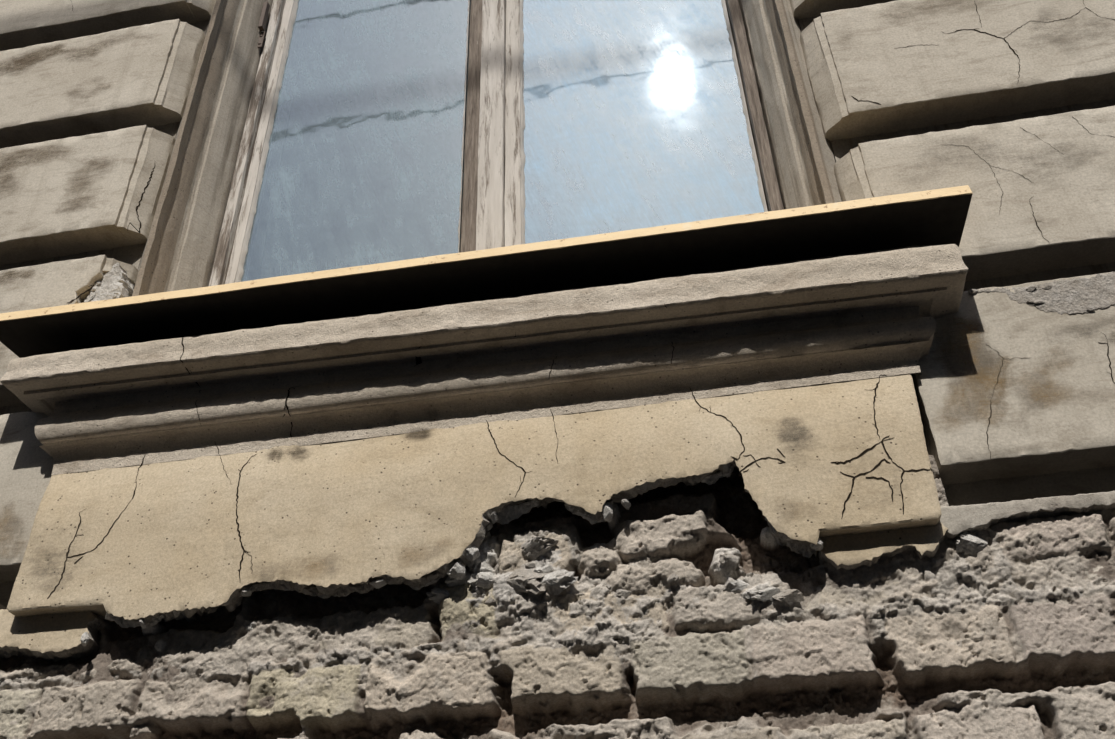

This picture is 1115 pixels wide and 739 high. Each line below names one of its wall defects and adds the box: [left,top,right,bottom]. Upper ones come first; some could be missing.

crack [894,3,1115,84]
flaking render [84,262,134,302]
peeling [968,272,1115,315]
crack [180,337,256,579]
crack [486,420,531,494]
crack [690,388,785,476]
crack [831,374,933,519]
crack [47,452,147,599]
flaking render [231,546,480,604]
flaking render [565,498,631,524]
flaking render [770,526,824,558]
flaking render [105,610,181,629]